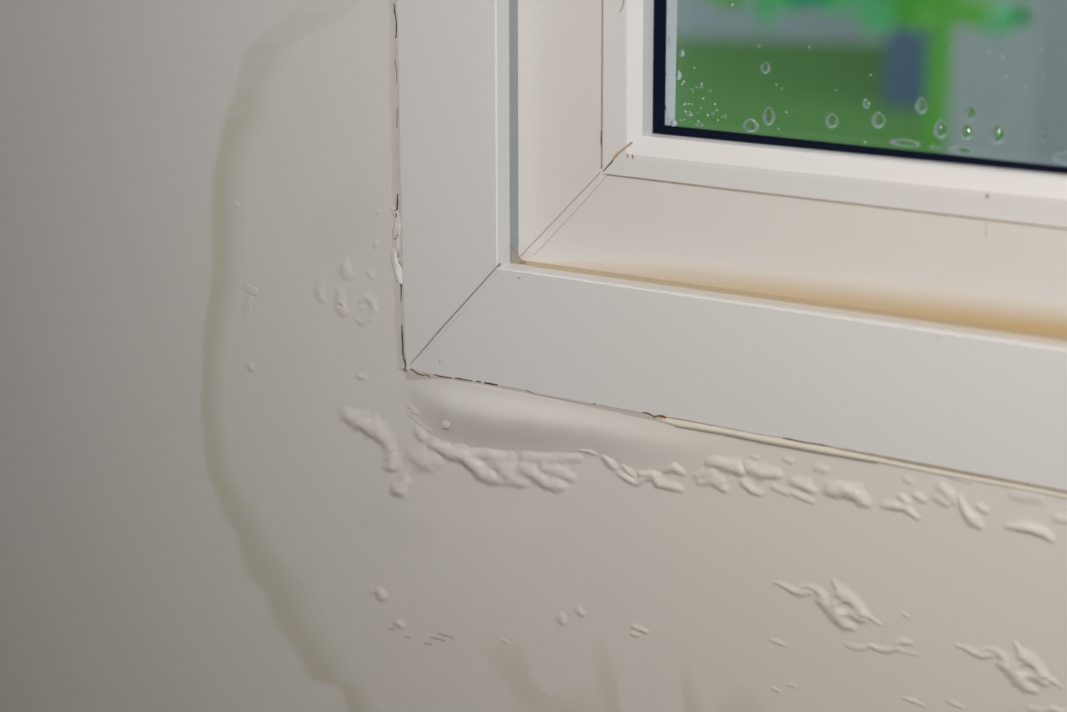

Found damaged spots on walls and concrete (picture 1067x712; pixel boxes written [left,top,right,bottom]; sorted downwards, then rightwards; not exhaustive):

damp [199,0,381,712]
damp [480,633,625,712]